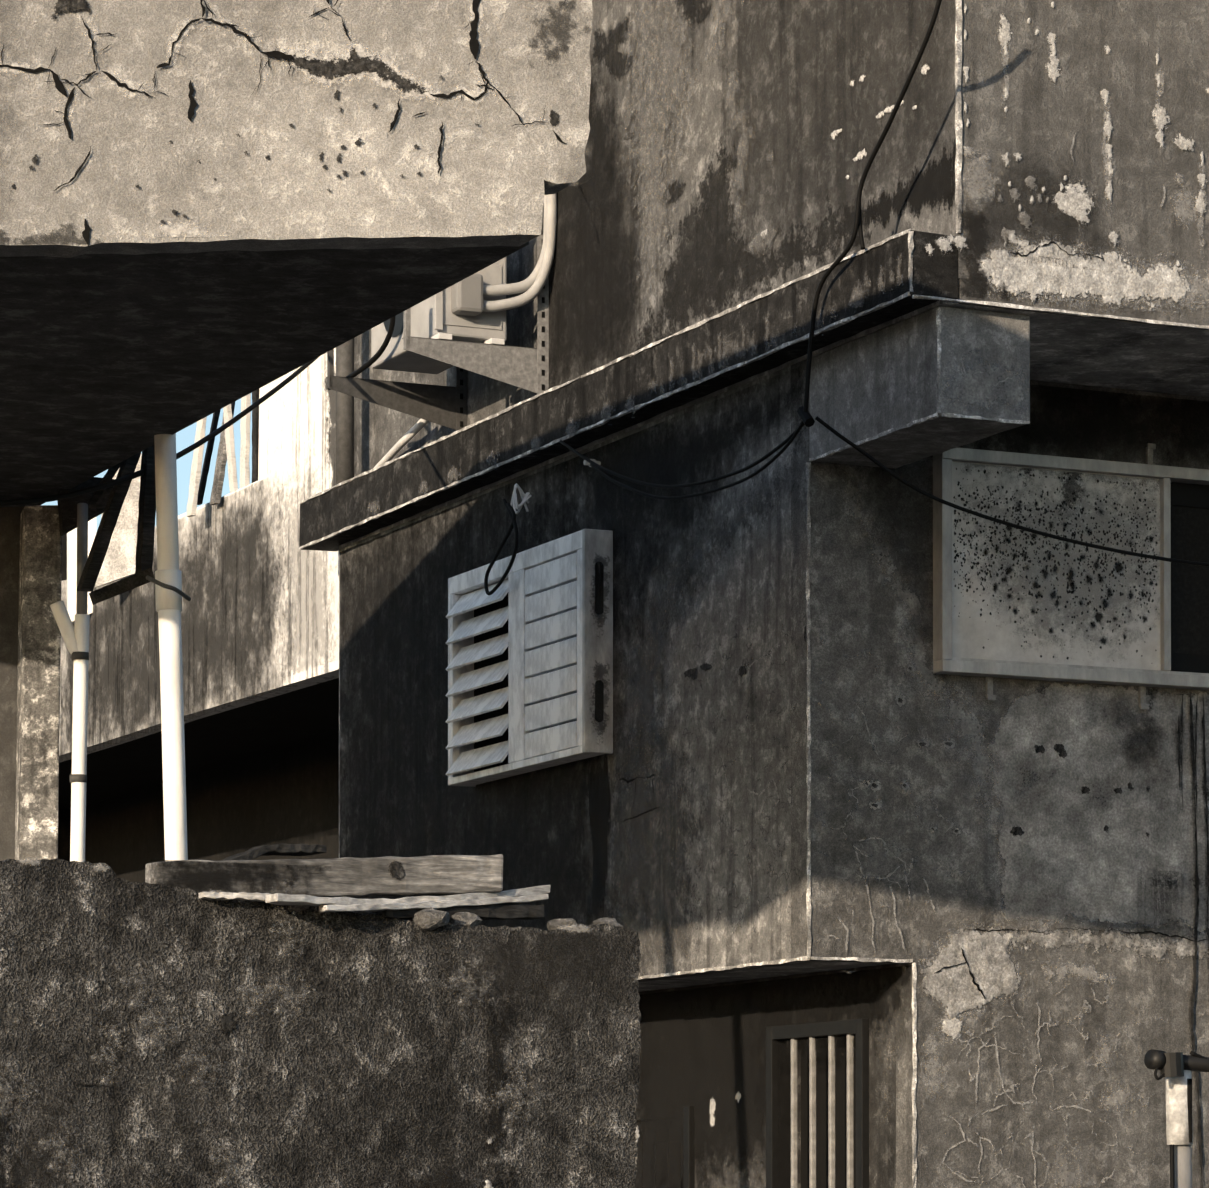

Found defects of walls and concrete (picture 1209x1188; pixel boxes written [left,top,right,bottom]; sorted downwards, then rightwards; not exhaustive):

crack [0,0,294,191]
crack [309,0,351,42]
crack [389,0,566,175]
water stain [675,0,711,26]
water stain [635,137,1009,351]
water stain [648,315,777,394]
crack [619,633,983,958]
water stain [836,467,1209,1052]
peeling [919,922,1026,1096]
crack [934,983,1154,1188]